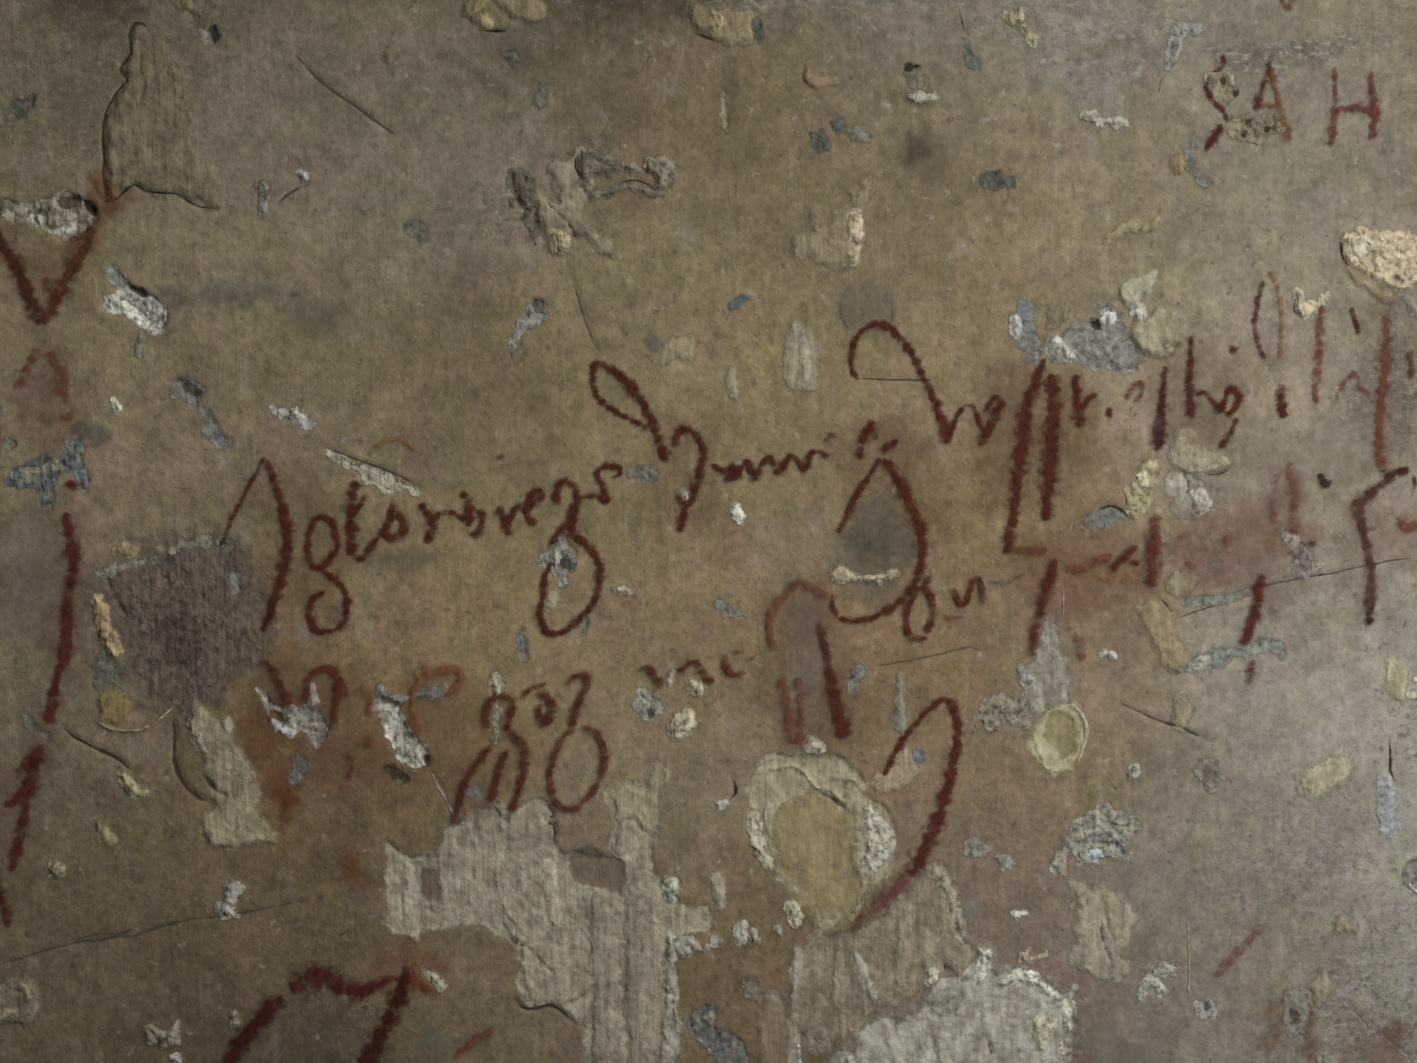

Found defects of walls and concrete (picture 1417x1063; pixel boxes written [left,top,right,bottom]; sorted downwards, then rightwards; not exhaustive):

crack [96,184,213,209]
flaking render [506,145,679,259]
flaking render [103,266,169,358]
flaking render [1008,269,1186,375]
flaking render [1340,226,1417,341]
flaking render [973,586,1089,776]
flaking render [371,661,1177,1063]
flaking render [1403,857,1417,893]